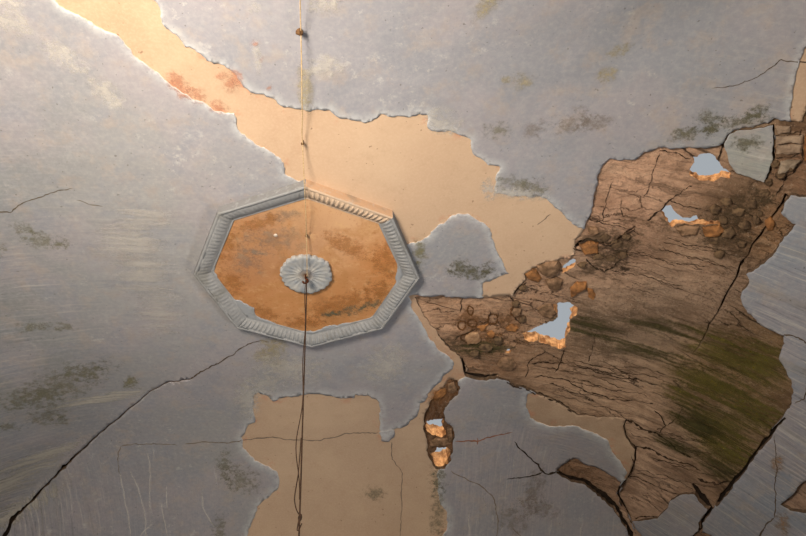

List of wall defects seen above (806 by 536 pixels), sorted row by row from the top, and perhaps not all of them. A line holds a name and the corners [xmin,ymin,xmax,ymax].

crack [716,59,806,88]
peeling [55,0,583,297]
crack [0,188,103,213]
leakage [450,261,490,280]
flaking render [242,48,806,536]
crack [191,340,267,379]
leakage [0,486,55,527]
crack [3,443,89,536]
crack [117,432,403,535]
crack [451,419,637,536]
crack [759,440,781,536]